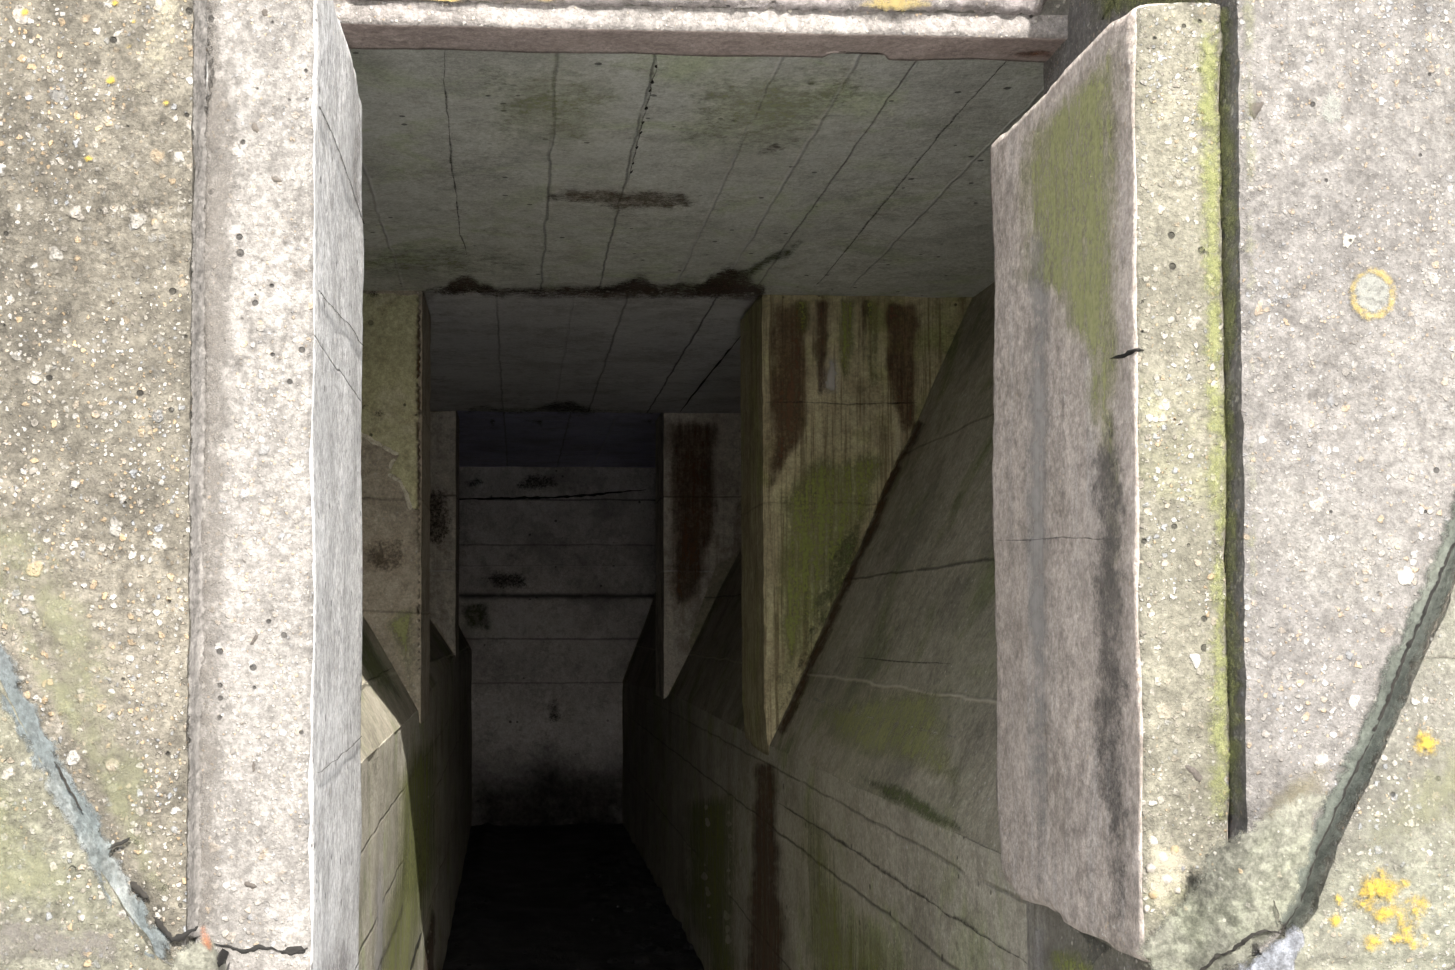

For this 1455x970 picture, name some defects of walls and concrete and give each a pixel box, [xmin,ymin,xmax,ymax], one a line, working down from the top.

crack [443,55,467,254]
leakage [549,190,692,209]
crack [629,59,657,177]
crack [825,62,1006,276]
peeling [361,293,420,510]
leakage [416,269,918,544]
leakage [368,541,402,570]
leakage [671,422,718,604]
crack [107,837,130,850]
crack [130,881,308,967]
crack [1200,542,1455,970]